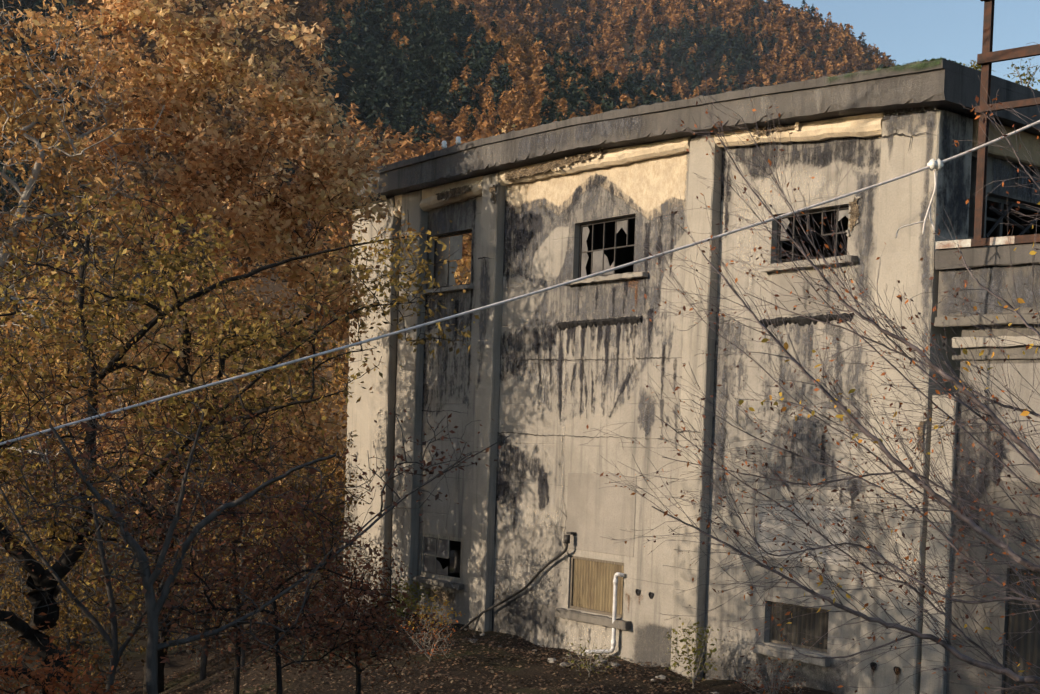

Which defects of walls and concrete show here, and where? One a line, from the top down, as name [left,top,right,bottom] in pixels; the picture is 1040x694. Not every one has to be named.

damp [422,199,490,418]
damp [500,174,685,465]
damp [721,106,1040,373]
damp [494,434,557,544]